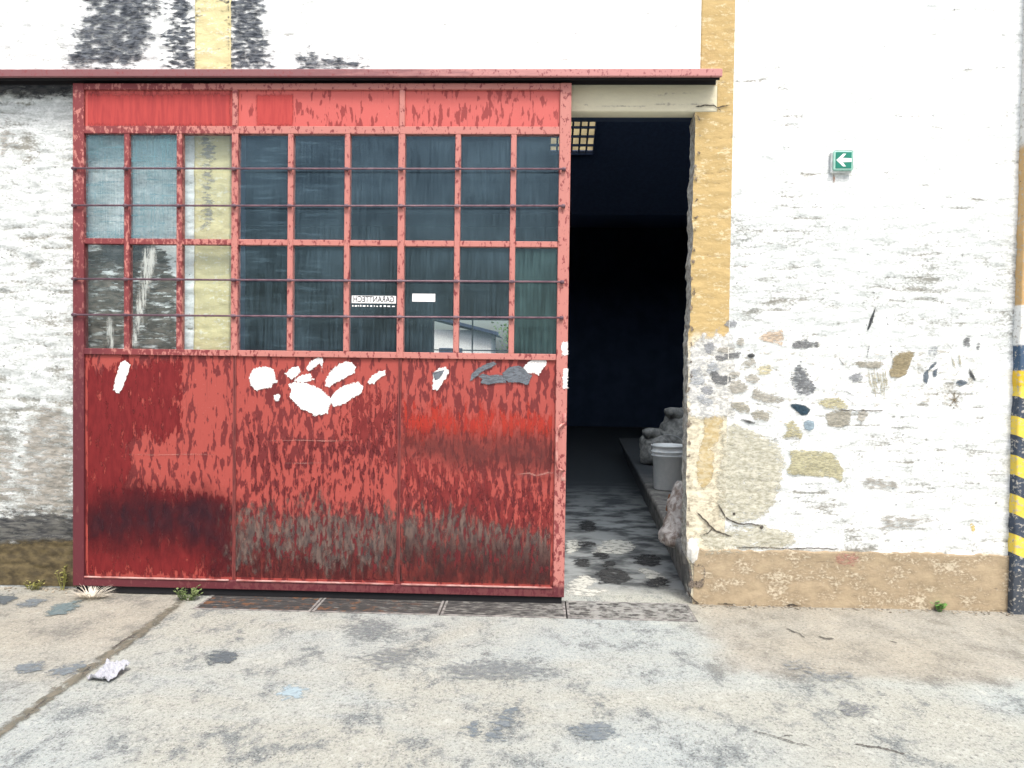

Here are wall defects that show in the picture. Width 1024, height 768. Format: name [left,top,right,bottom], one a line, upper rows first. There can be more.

damp [62,0,202,69]
damp [219,0,275,69]
damp [295,45,371,69]
peeling [88,354,553,584]
flaking render [686,326,796,554]
crack [698,506,837,550]